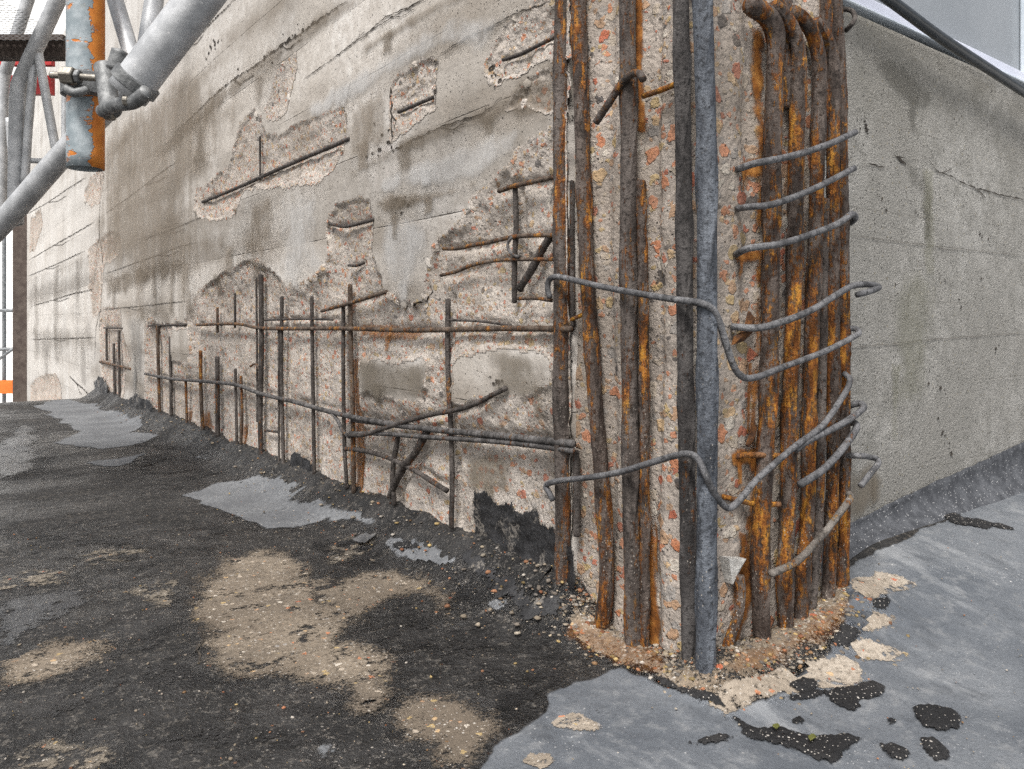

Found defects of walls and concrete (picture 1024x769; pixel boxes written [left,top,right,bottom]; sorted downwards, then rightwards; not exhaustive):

rust [636,0,646,132]
rust [740,29,764,190]
water stain [106,94,205,278]
crack [869,155,1023,200]
water stain [360,362,420,403]
spalling [29,0,917,674]
rust [731,306,759,351]
rust [732,363,758,484]
rust [736,250,762,281]
rust [649,512,660,647]
rust [735,498,753,641]